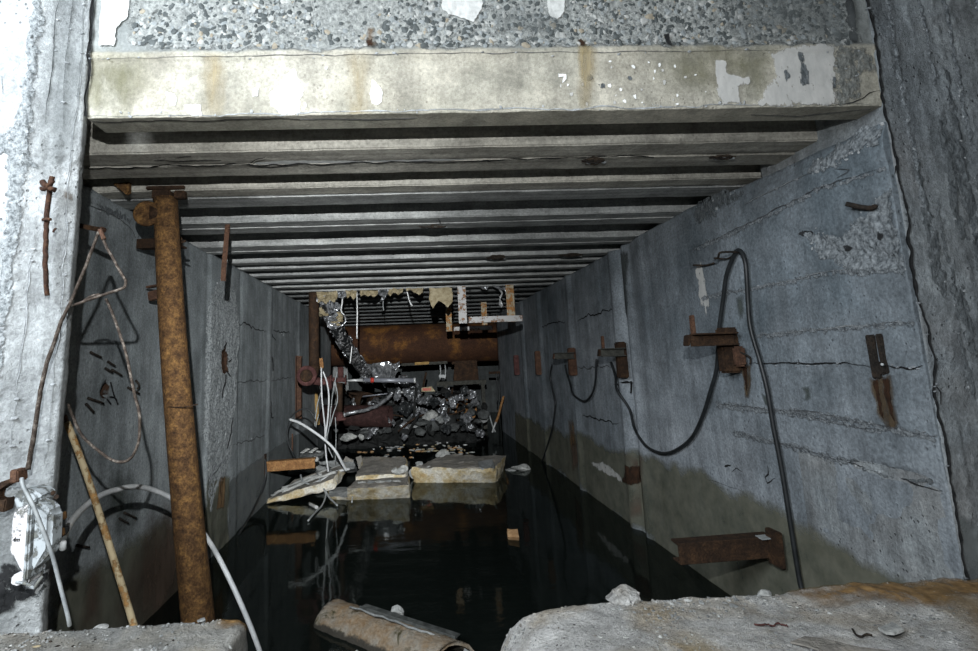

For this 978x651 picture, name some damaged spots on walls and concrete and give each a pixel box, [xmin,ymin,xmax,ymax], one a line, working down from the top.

crack [45,0,692,124]
spalling [98,0,876,118]
spalling [799,189,906,276]
crack [693,0,970,581]
corrosion [871,376,897,429]
damp [0,563,54,613]
damp [54,522,173,631]